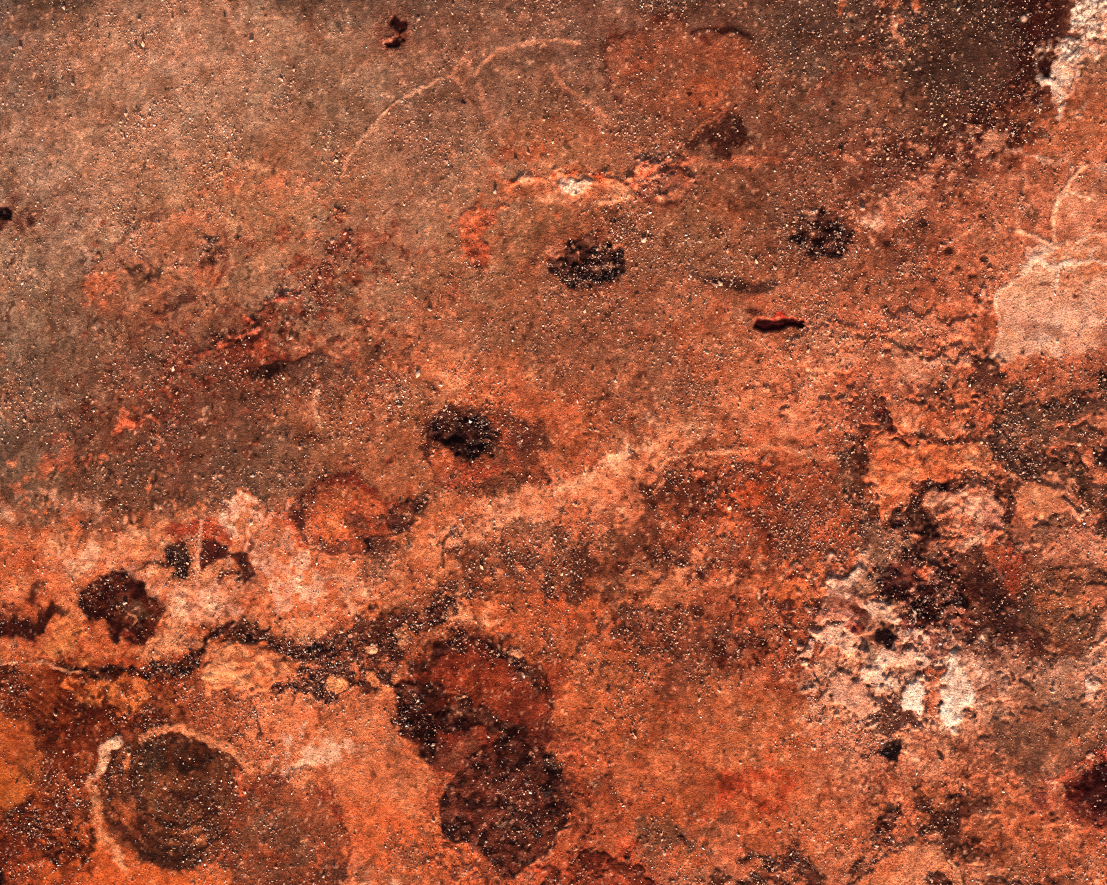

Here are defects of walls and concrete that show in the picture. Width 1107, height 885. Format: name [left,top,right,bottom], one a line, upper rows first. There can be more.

rust [591,8,783,129]
rust [446,106,631,279]
efflorescence [980,173,1107,383]
rust [0,502,275,658]
rust [266,457,404,595]
rust [377,615,597,780]
water stain [789,540,1107,798]
rust [1025,745,1107,847]